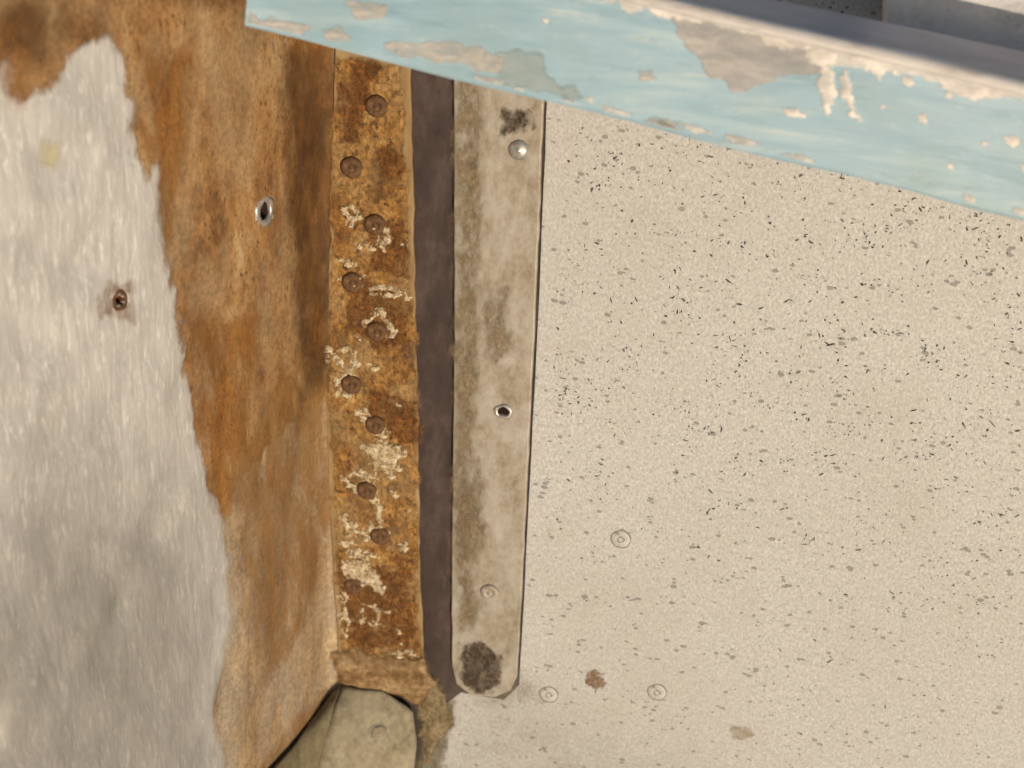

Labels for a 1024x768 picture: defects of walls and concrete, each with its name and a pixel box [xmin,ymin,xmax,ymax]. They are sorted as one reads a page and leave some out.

peeling [384,41,630,116]
peeling [603,0,1024,122]
peeling [646,118,712,135]
rust [0,0,423,661]
rust [585,670,605,689]